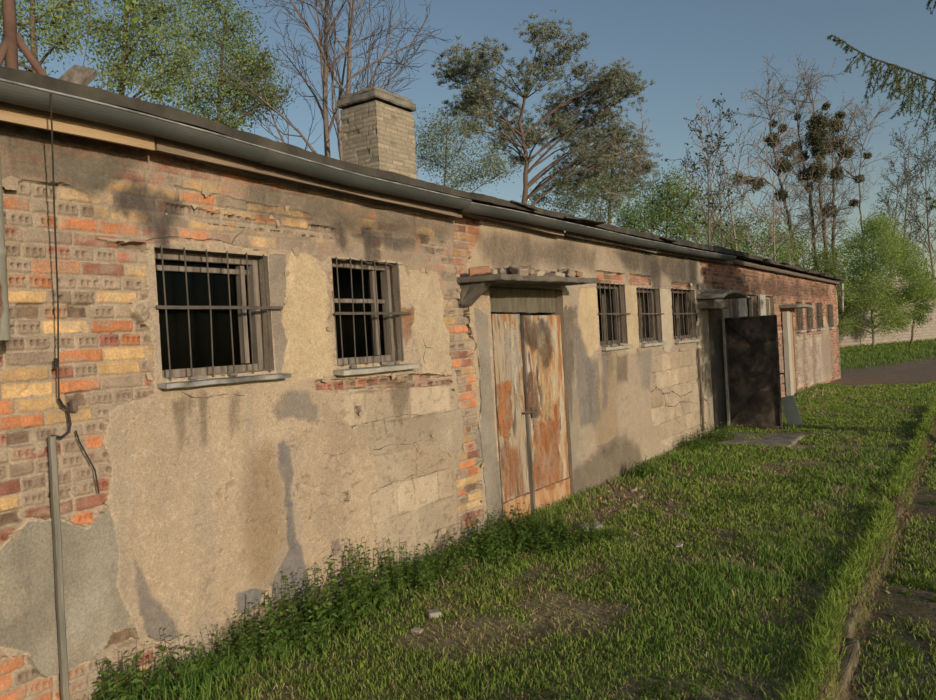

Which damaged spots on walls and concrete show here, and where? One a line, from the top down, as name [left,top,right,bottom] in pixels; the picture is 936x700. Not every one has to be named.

flaking render [0,121,583,547]
corrosion [496,381,524,498]
corrosion [533,344,563,489]
damp [564,309,640,496]
damp [216,442,354,653]
flaking render [0,628,176,700]